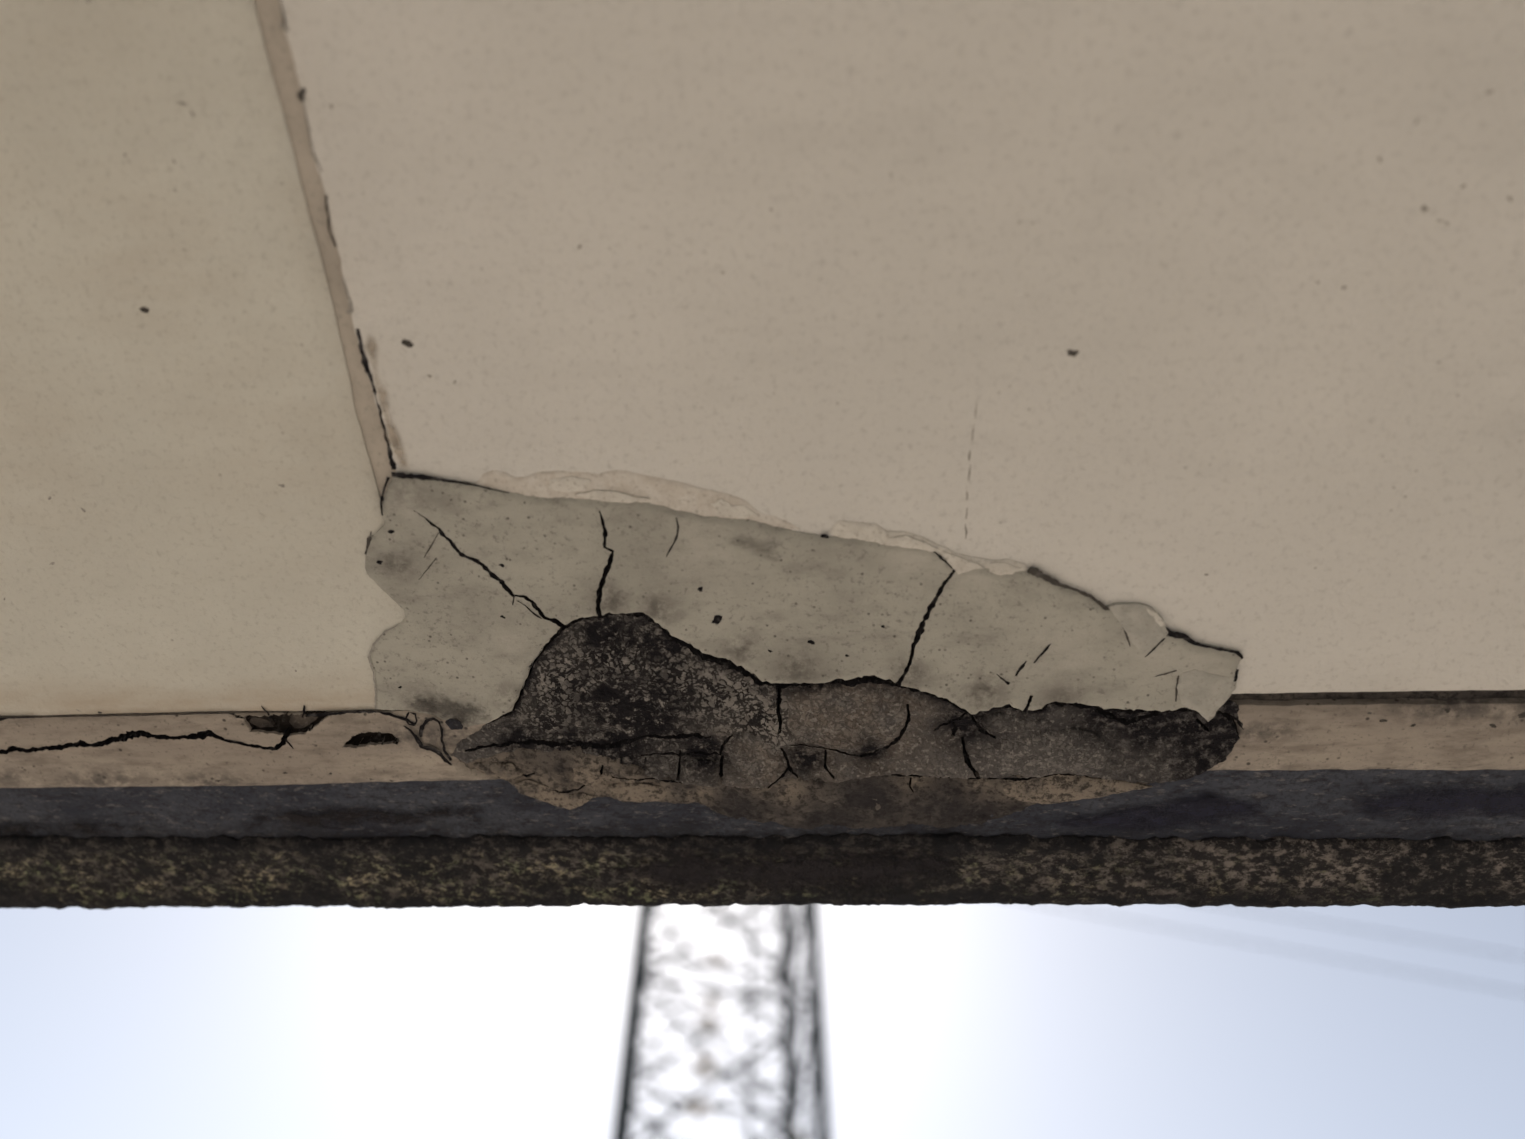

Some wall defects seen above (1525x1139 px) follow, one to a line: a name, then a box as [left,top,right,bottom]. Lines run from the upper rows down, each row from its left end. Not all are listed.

crack [0,100,1244,793]
peeling [365,470,1244,830]